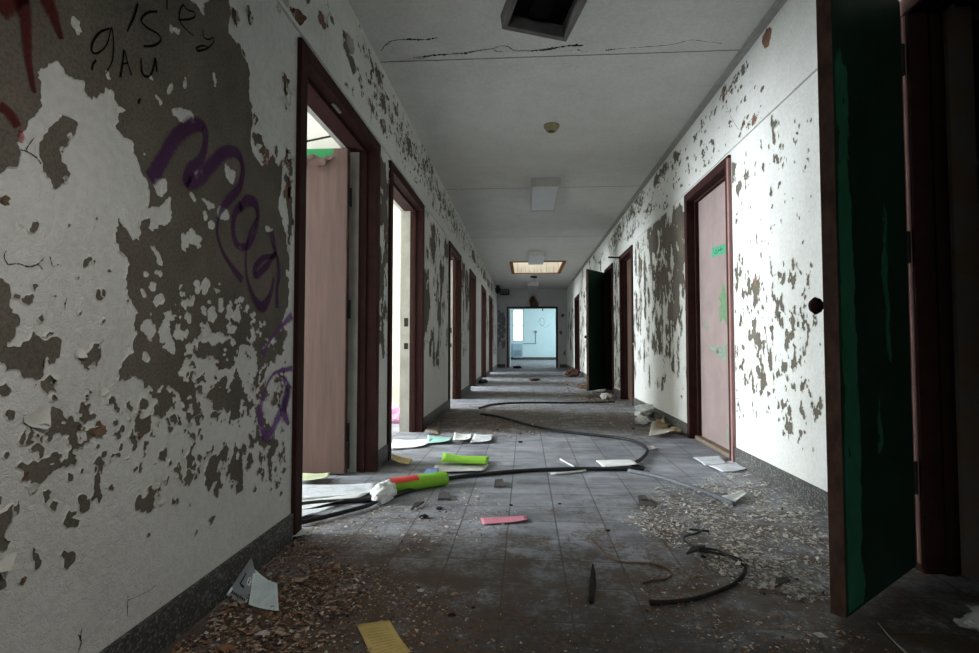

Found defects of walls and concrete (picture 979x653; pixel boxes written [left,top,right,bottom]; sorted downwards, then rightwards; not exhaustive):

peeling [0,0,294,591]
peeling [276,0,506,370]
crack [364,37,722,59]
peeling [559,60,765,398]
peeling [762,27,772,49]
peeling [732,114,824,453]